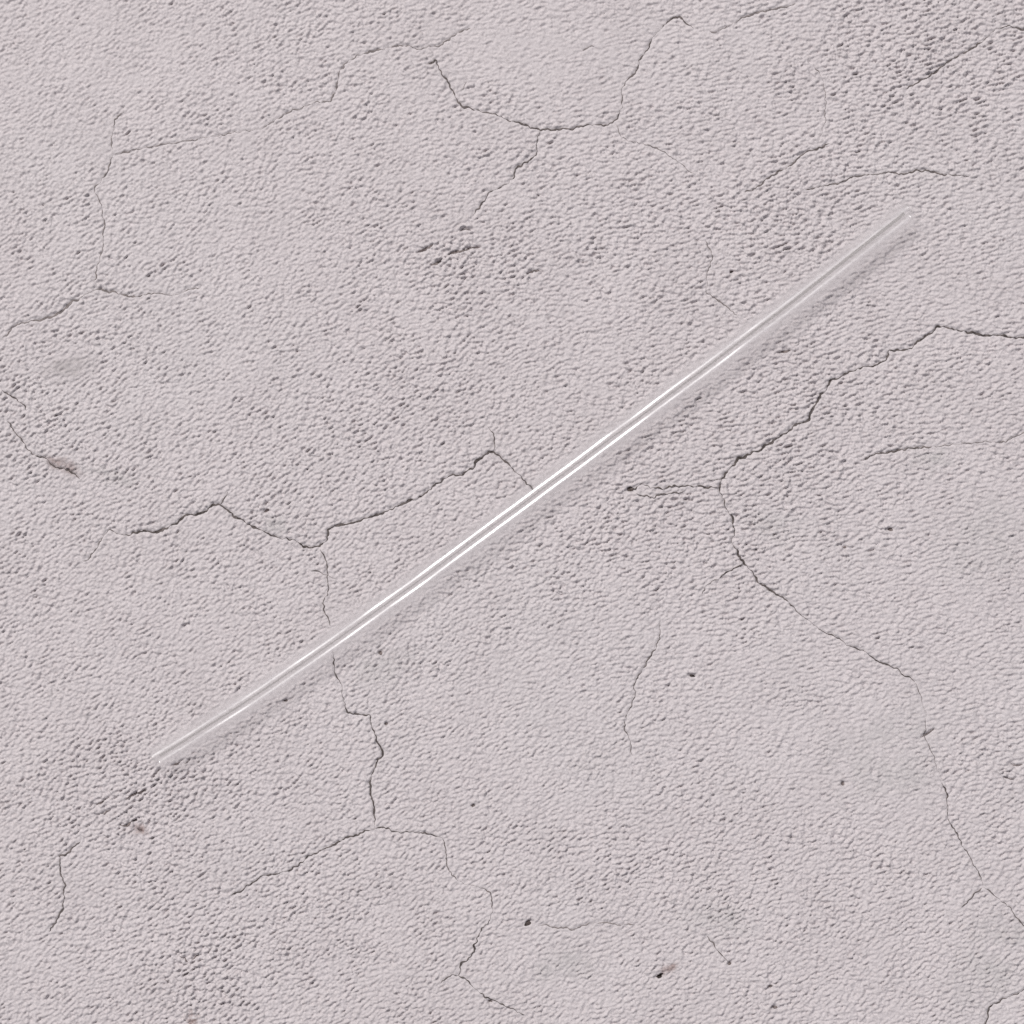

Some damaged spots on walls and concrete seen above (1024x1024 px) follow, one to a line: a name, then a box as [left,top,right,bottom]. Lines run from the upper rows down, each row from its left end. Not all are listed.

crack [906,25,1024,90]
crack [3,3,795,337]
crack [745,69,829,192]
crack [806,169,969,190]
crack [2,390,79,478]
crack [83,426,534,625]
crack [631,325,1024,926]
crack [624,626,660,754]
crack [50,842,80,930]
crack [232,655,524,1015]
crack [545,922,633,930]
crack [985,989,1024,1024]